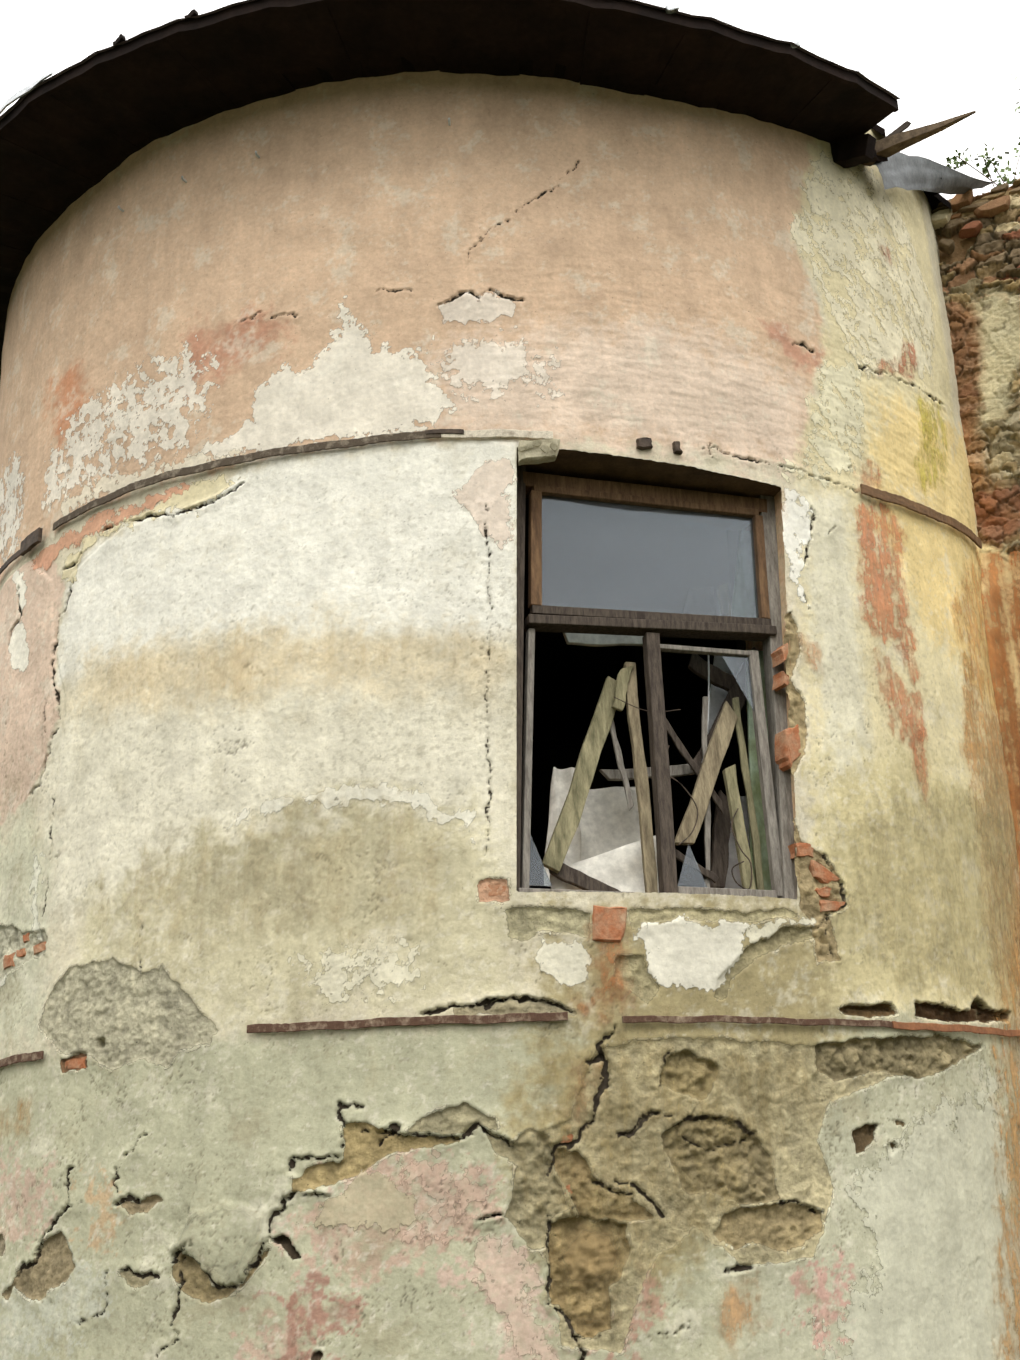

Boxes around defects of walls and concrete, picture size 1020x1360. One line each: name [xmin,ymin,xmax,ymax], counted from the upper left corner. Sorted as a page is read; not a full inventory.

crack [32,563,76,854]
crack [104,482,245,531]
peeling [0,289,565,672]
peeling [770,151,935,791]
rust [857,503,927,795]
peeling [476,818,849,1004]
rust [952,550,1020,1360]
spalling [2,1228,76,1303]
crack [545,1180,665,1360]
crack [546,1026,754,1176]
spalling [289,1034,1020,1360]
crack [724,1264,752,1273]